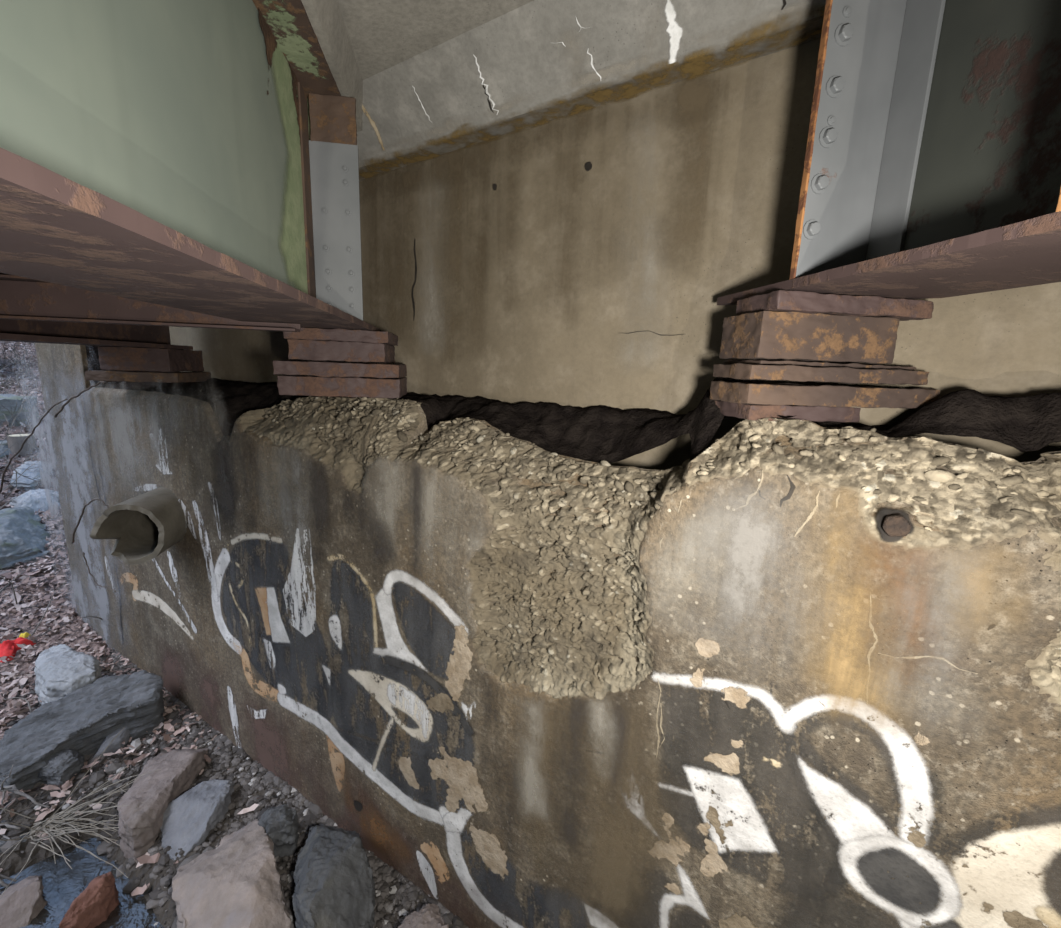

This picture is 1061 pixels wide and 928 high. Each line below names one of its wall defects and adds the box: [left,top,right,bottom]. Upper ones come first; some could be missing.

crack [559,18,601,80]
water stain [665,0,682,64]
crack [473,55,499,114]
water stain [22,376,223,646]
spalling [235,396,1061,713]
peeling [398,756,419,789]
peeling [428,746,509,879]
peeling [420,841,450,884]